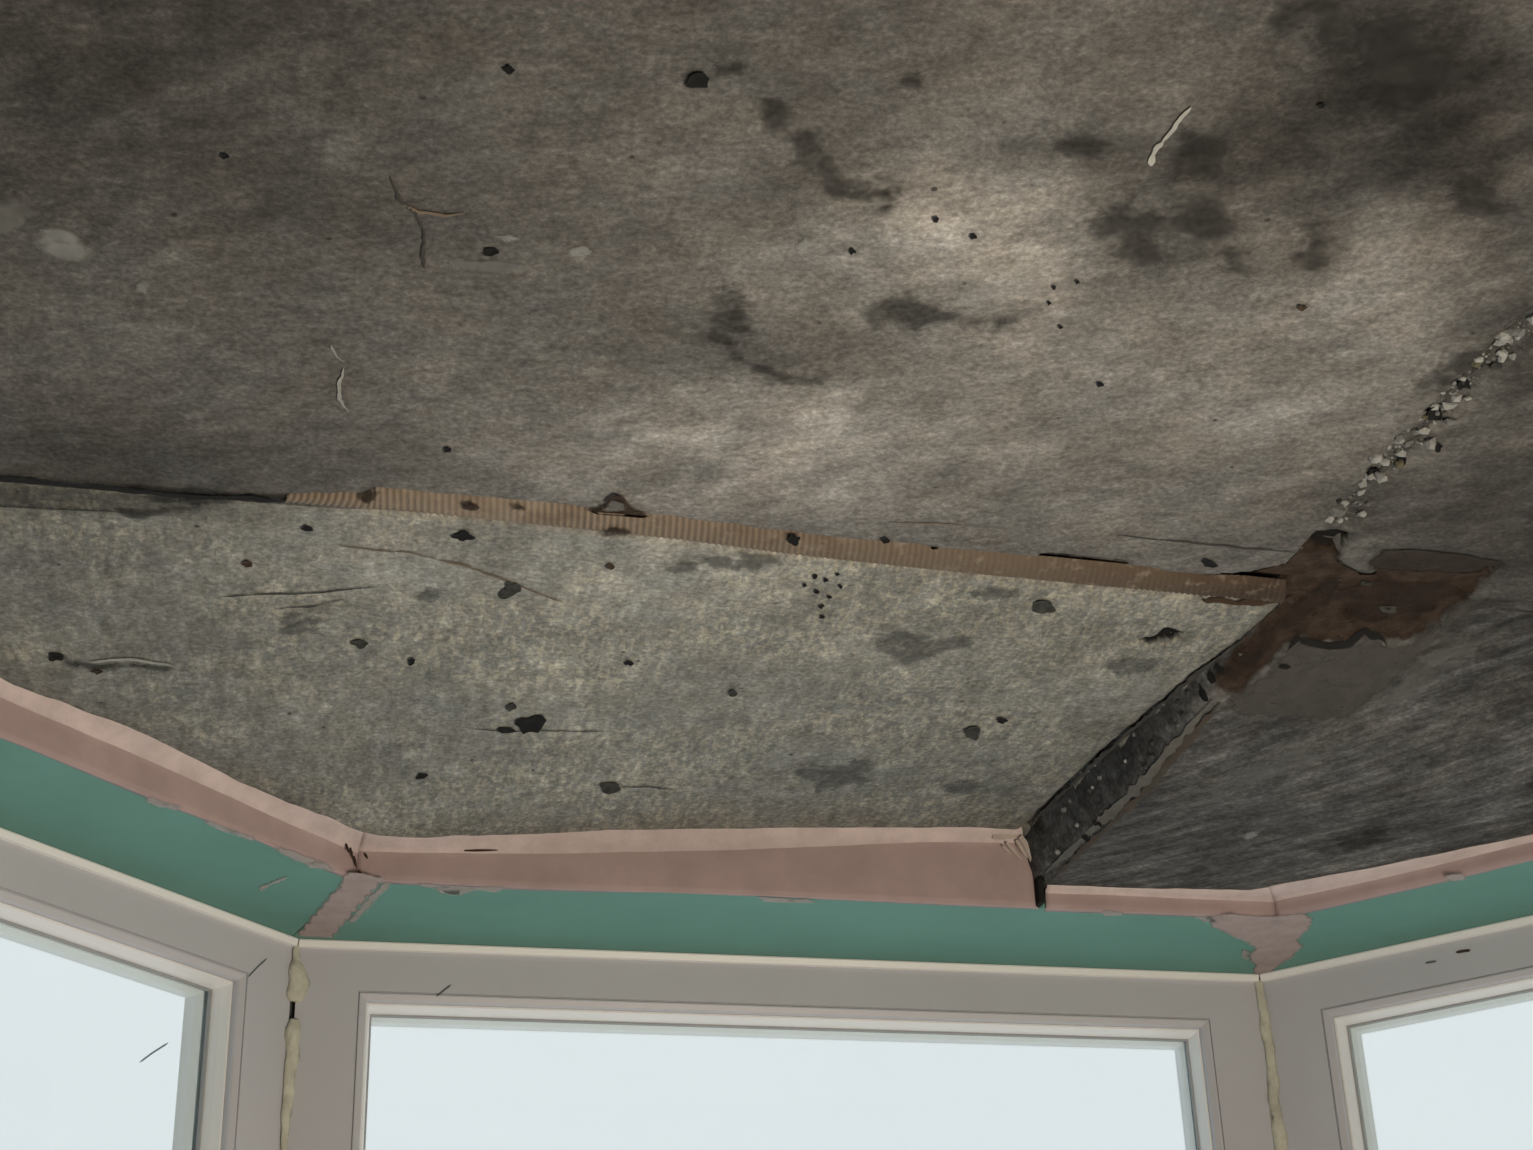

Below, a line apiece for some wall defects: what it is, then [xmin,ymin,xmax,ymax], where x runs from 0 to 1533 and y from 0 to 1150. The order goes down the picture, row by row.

water stain [1148,107,1192,166]
rust [1203,538,1496,692]